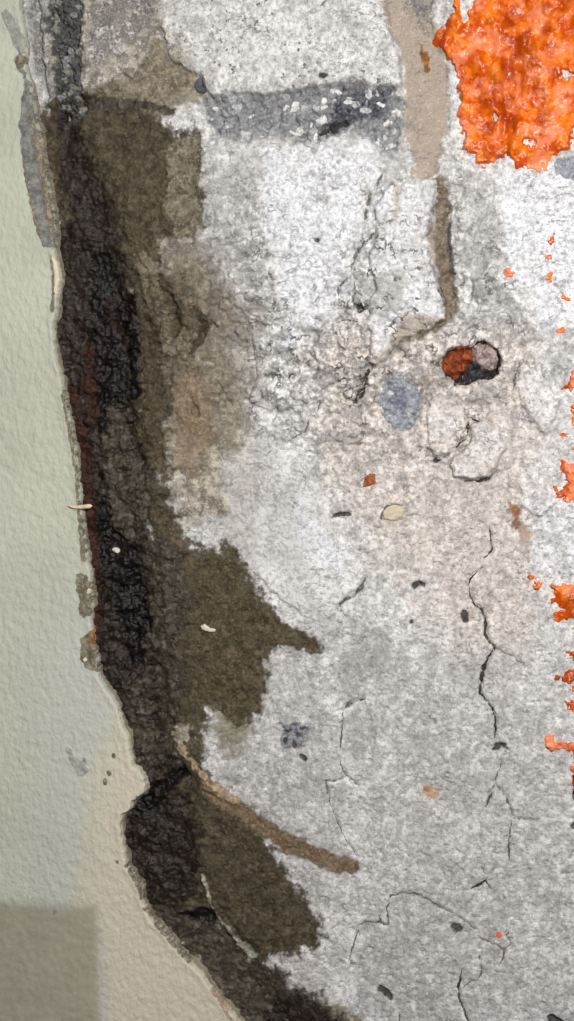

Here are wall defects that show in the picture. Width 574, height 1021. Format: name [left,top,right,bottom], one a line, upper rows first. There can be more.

spalling [42,0,89,127]
rust [419,46,430,72]
peeling [2,9,65,312]
damp [446,222,455,273]
peeling [61,390,96,618]
peeling [80,630,103,672]
damp [40,43,361,1021]
crack [339,578,366,612]
crack [468,527,522,737]
peeling [121,762,150,817]
crack [485,763,520,859]
crack [350,892,511,1021]